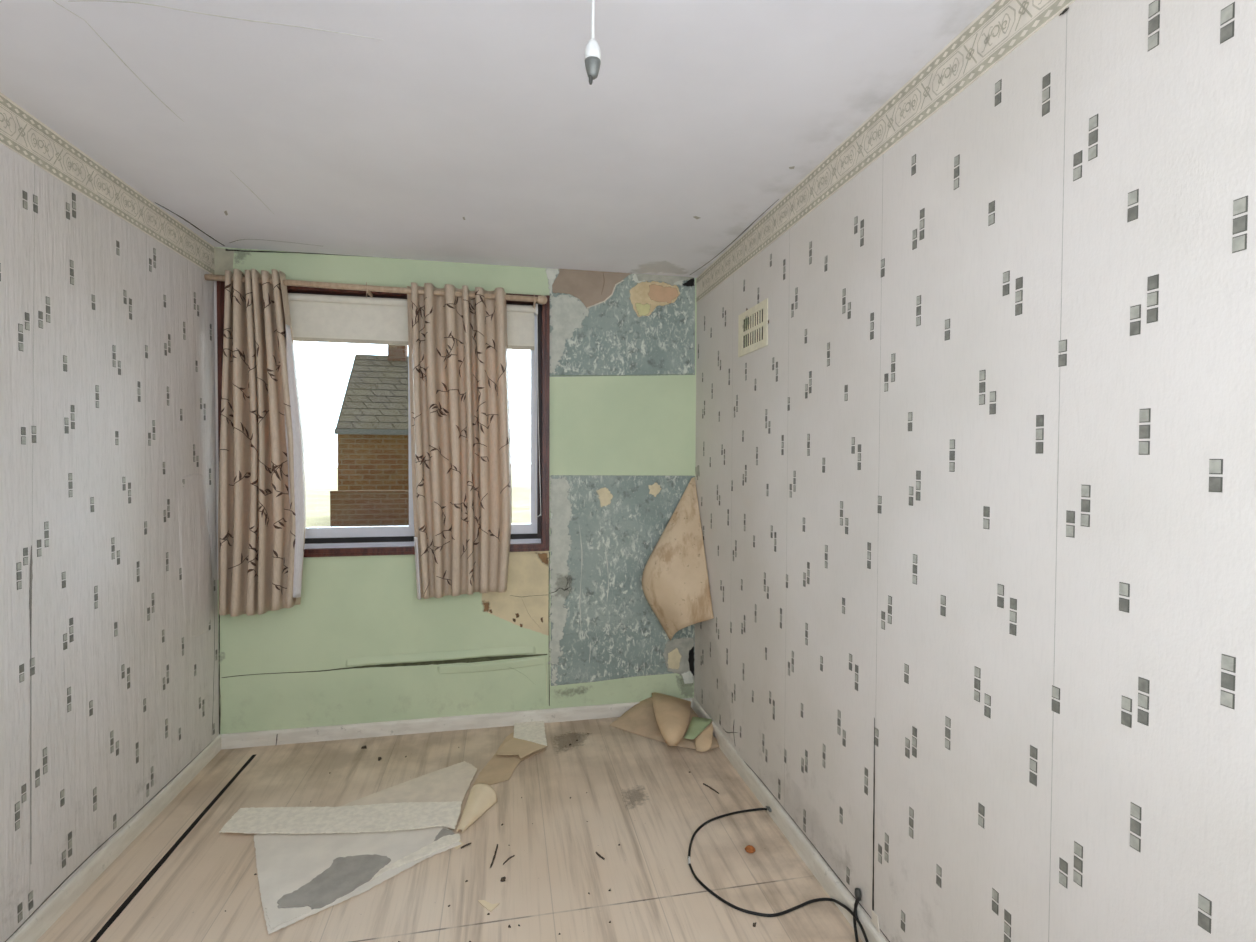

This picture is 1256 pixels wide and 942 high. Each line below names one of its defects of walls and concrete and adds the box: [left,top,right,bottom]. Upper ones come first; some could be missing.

crack [53,0,381,122]
crack [156,170,397,259]
peeling [546,268,694,317]
flaking render [596,487,613,507]
flaking render [648,483,662,497]
flaking render [663,637,695,684]
crack [5,545,570,942]